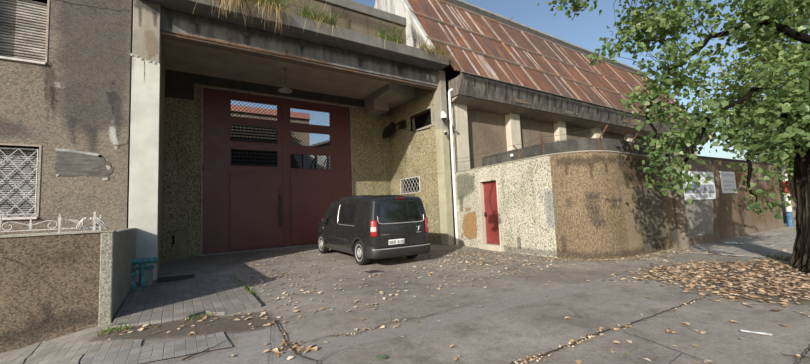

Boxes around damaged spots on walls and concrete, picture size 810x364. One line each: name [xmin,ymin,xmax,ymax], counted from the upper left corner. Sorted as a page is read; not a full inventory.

peeling [109,120,118,149]
peeling [461,208,477,239]
crack [248,295,467,364]
crack [511,296,715,364]